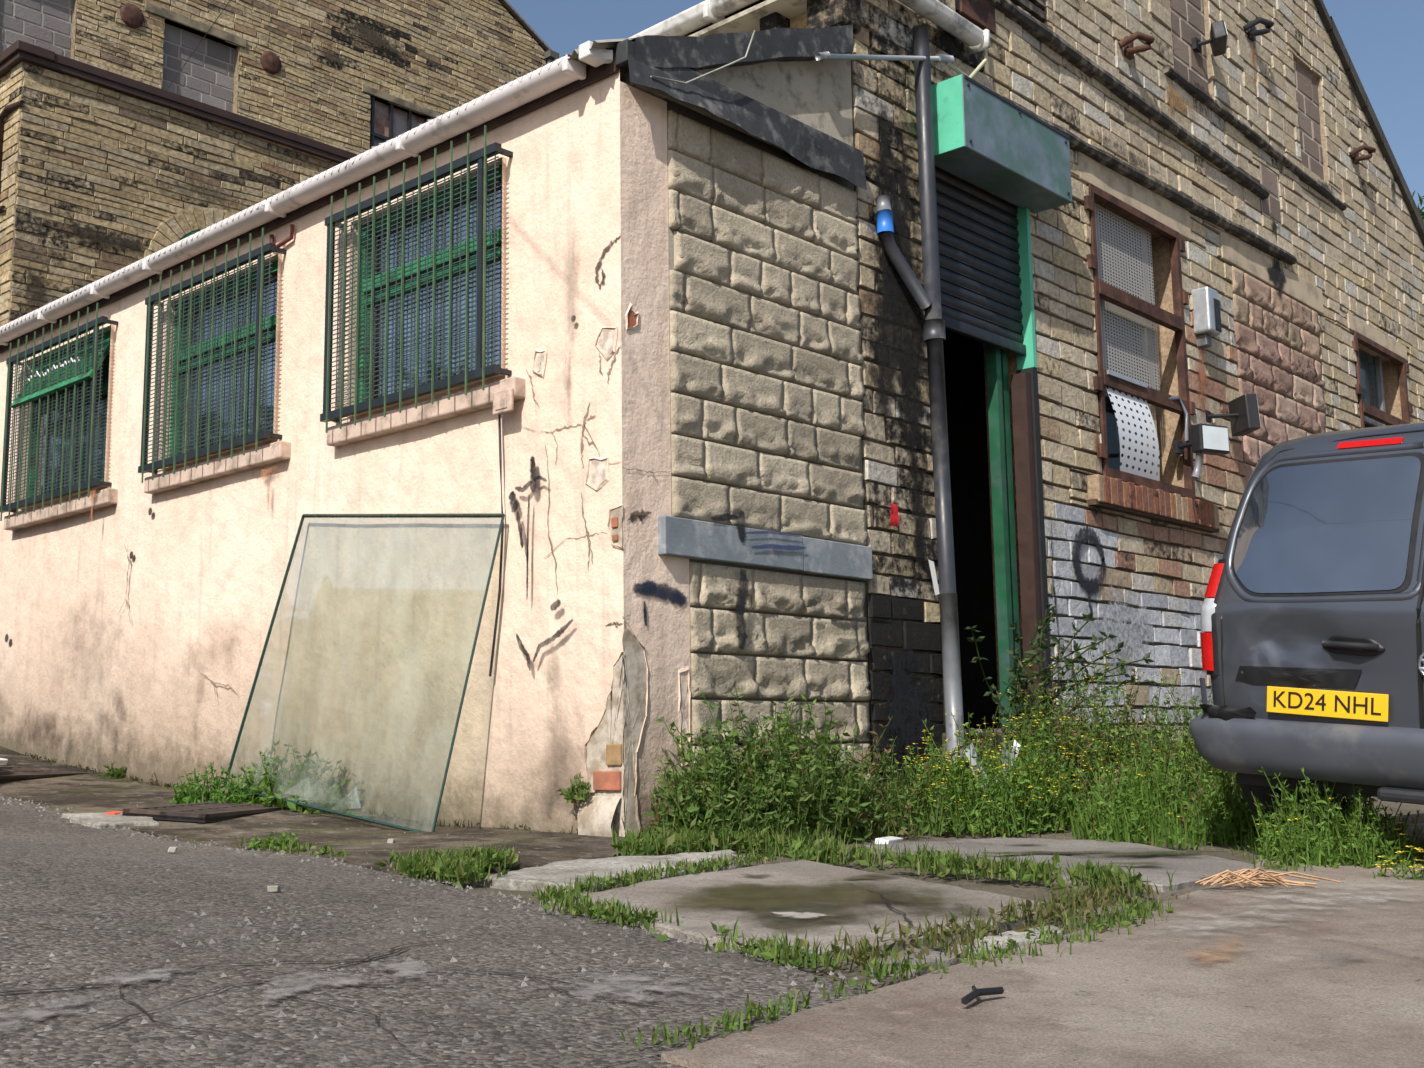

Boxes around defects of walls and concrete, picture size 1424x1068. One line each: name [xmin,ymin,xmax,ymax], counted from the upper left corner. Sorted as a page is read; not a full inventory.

leakage [877,104,892,195]
crack [524,345,671,592]
leakage [909,465,926,573]
flaking render [577,616,648,837]